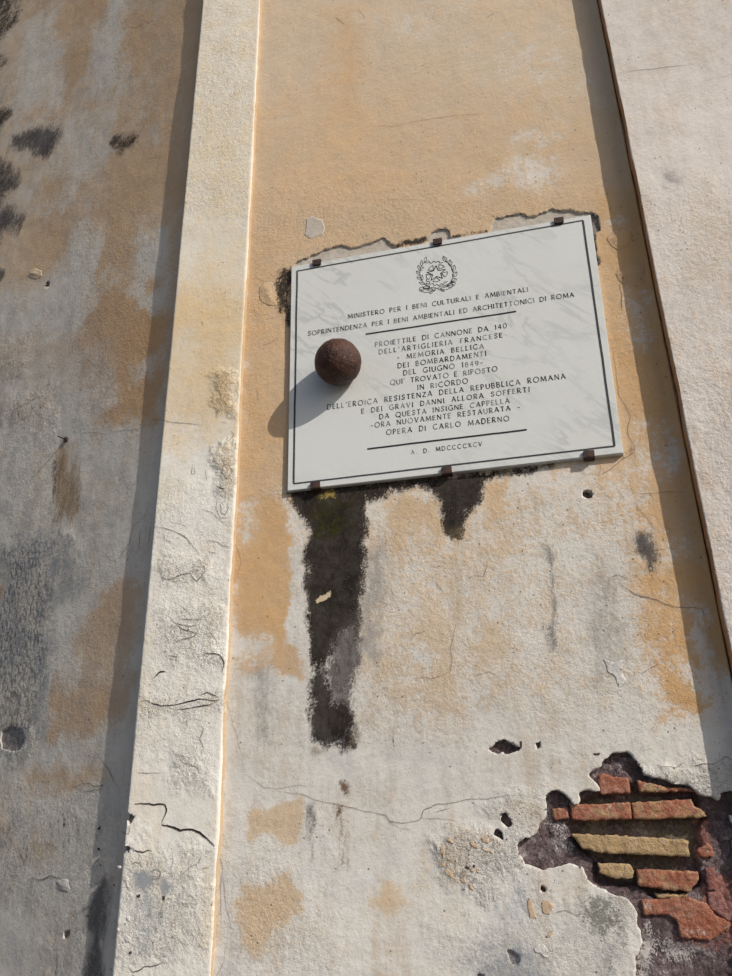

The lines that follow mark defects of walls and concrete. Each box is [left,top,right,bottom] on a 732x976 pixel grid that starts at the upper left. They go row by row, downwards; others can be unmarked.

water stain [0,0,20,40]
water stain [0,103,12,127]
water stain [8,126,62,159]
water stain [0,159,25,237]
flaking render [427,229,460,243]
flaking render [491,210,601,266]
water stain [288,463,554,753]
crack [610,575,705,617]
crack [155,613,224,677]
crack [140,692,510,833]
crack [123,803,229,916]
flaking render [517,752,732,976]